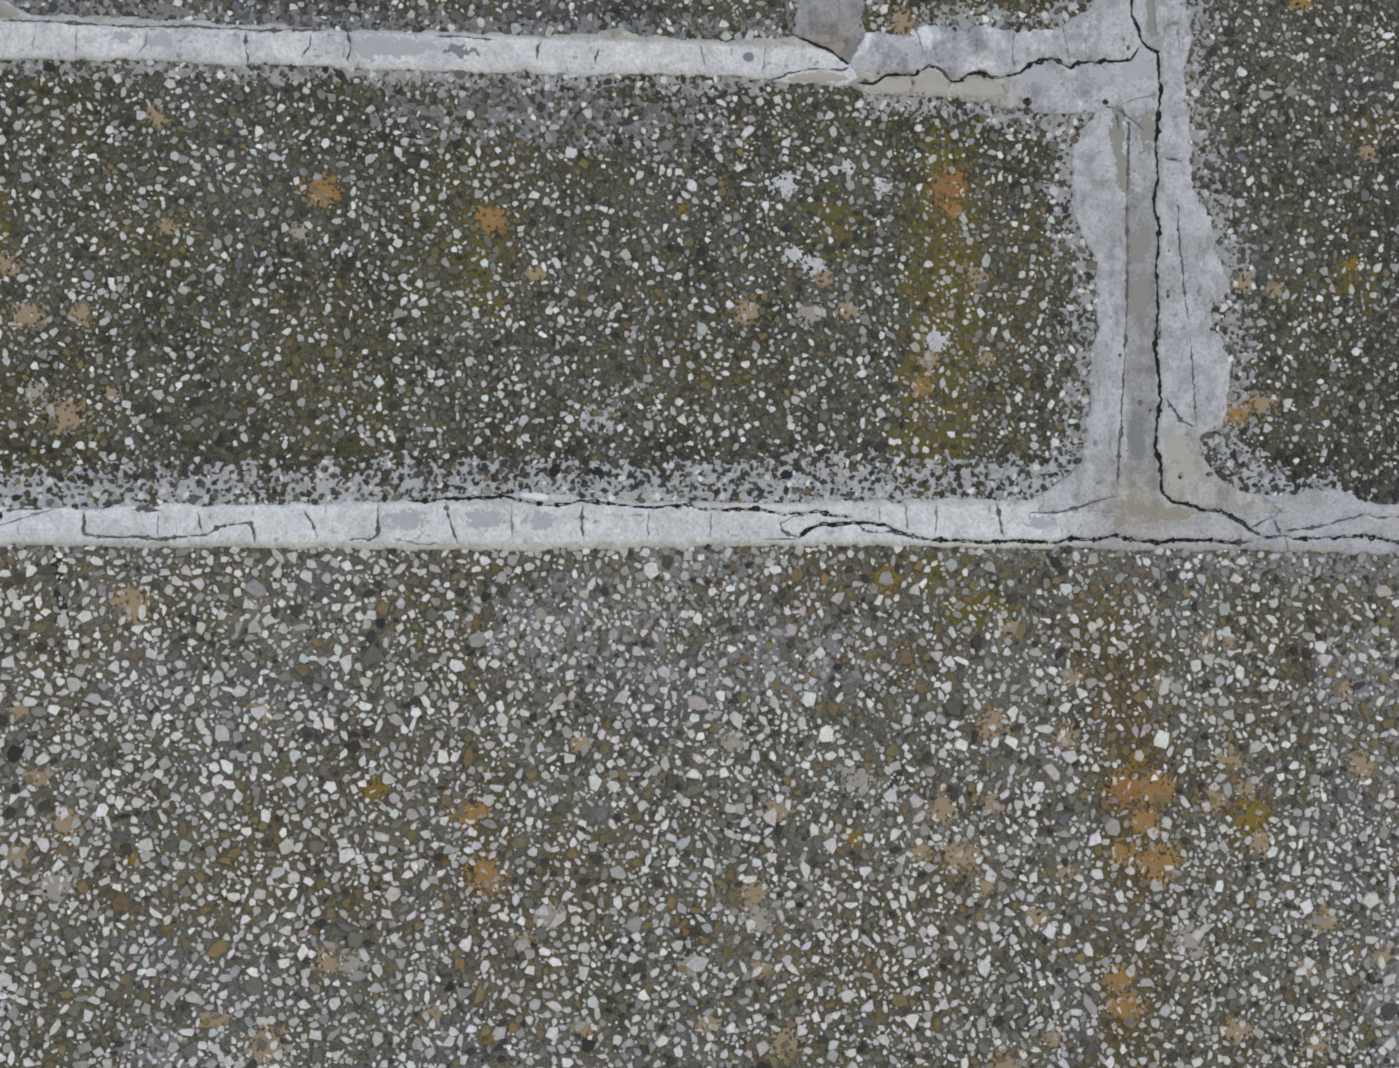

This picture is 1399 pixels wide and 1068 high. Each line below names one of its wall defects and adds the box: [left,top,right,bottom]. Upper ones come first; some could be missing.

crack [0,505,256,542]
crack [304,0,1399,552]